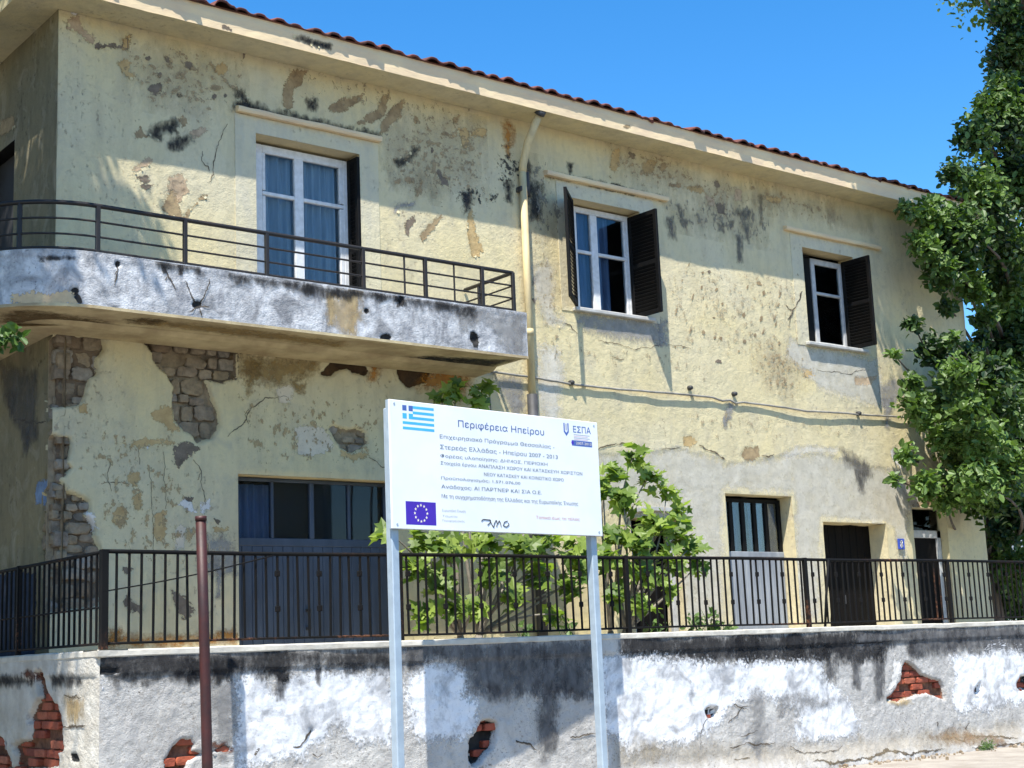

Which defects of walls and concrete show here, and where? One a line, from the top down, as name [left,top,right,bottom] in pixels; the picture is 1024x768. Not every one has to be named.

crack [201,125,227,182]
damp [456,145,542,220]
damp [719,195,762,261]
crack [165,272,210,316]
crack [228,396,282,436]
flaking render [242,381,384,468]
flaking render [41,334,239,620]
flaking render [0,667,80,768]
damp [100,630,594,760]
flaking render [468,721,498,765]
damp [620,625,1024,700]
flaking render [886,659,947,705]